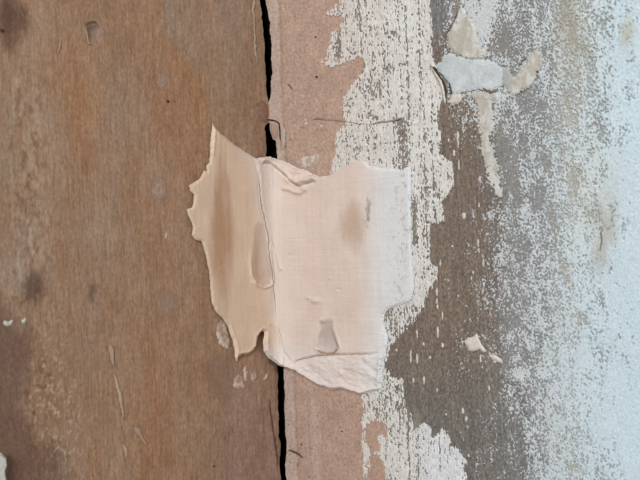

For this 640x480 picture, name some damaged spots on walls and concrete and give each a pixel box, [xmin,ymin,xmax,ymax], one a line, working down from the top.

crack [257,0,281,159]
crack [258,178,275,301]
peeling [321,0,640,480]
crack [267,357,304,480]